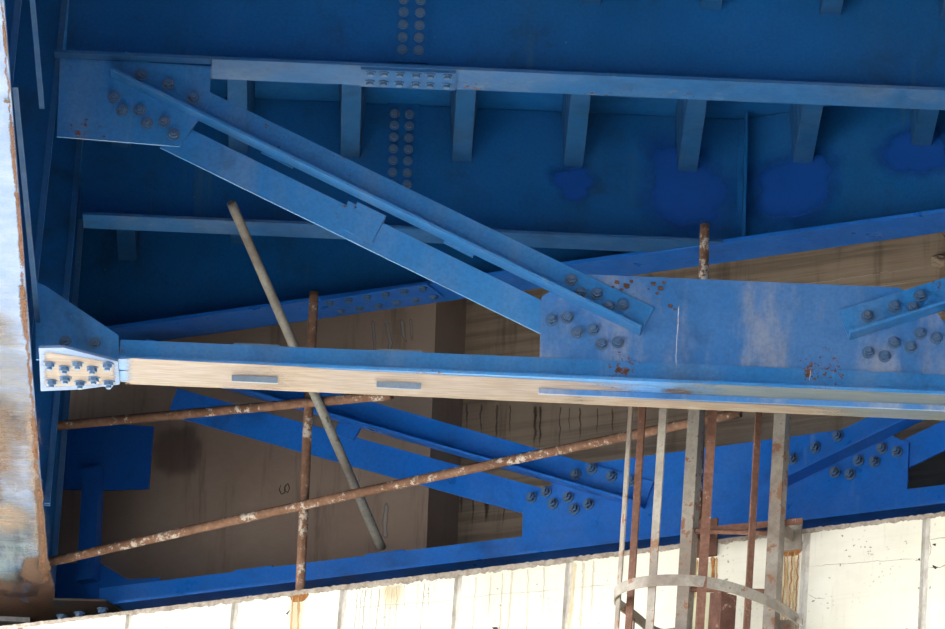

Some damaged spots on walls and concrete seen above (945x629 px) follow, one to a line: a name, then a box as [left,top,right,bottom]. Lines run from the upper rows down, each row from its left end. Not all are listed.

corrosion [0,3,51,580]
corrosion [44,353,115,387]
corrosion [126,358,840,416]
corrosion [290,593,308,629]